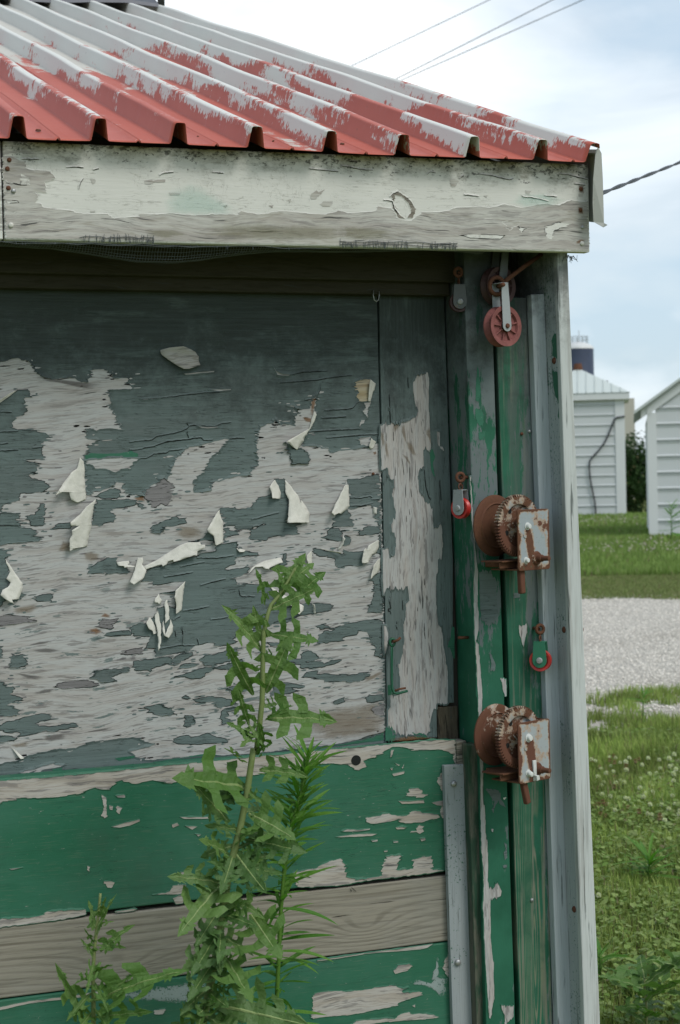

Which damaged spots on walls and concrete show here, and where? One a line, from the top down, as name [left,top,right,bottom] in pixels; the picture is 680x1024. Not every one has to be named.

peeling [1,157,590,251]
crack [384,190,400,214]
peeling [160,346,216,376]
peeling [0,355,456,828]
peeling [469,475,484,717]
peeling [292,772,444,888]
peeling [479,757,515,1024]
peeling [309,943,439,1024]